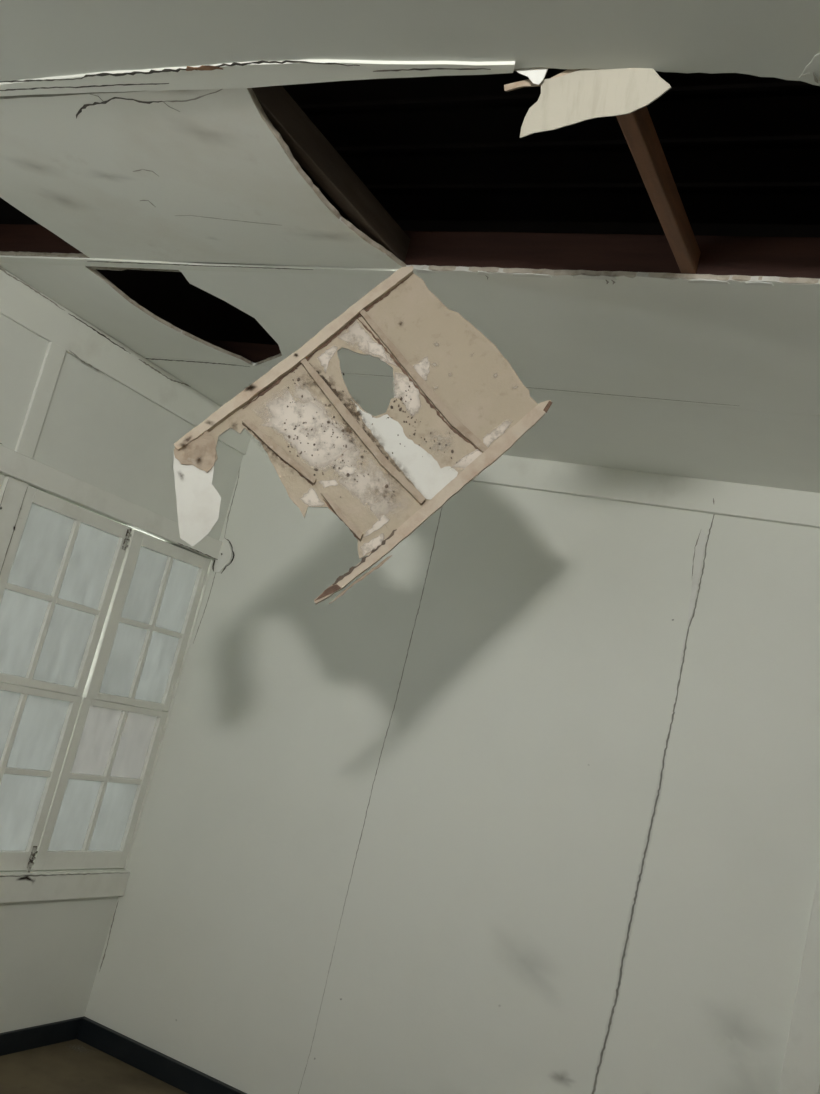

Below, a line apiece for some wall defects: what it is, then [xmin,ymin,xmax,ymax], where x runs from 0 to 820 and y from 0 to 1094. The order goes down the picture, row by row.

crack [0,60,491,119]
peeling [516,68,548,85]
damp [242,277,481,503]
crack [592,498,715,1094]